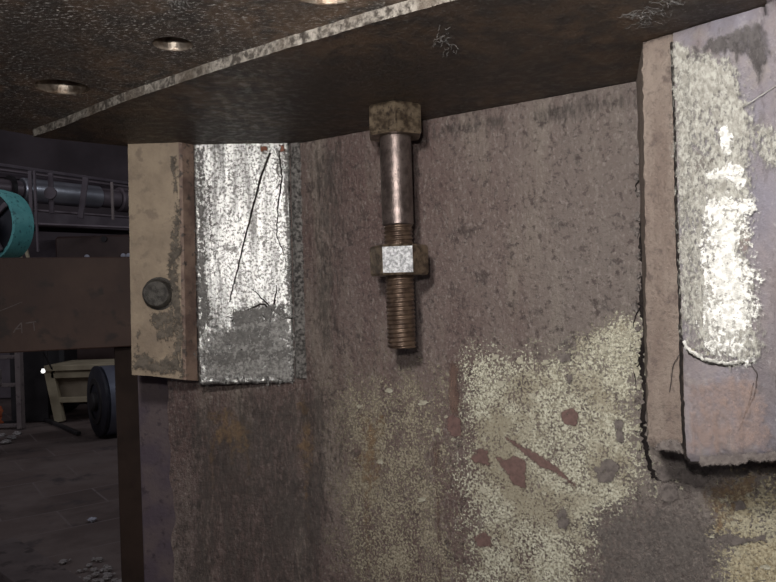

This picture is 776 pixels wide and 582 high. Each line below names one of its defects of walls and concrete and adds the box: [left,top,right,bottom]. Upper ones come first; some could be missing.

leakage [694,22,769,81]
crack [632,153,676,482]
crack [669,42,758,464]